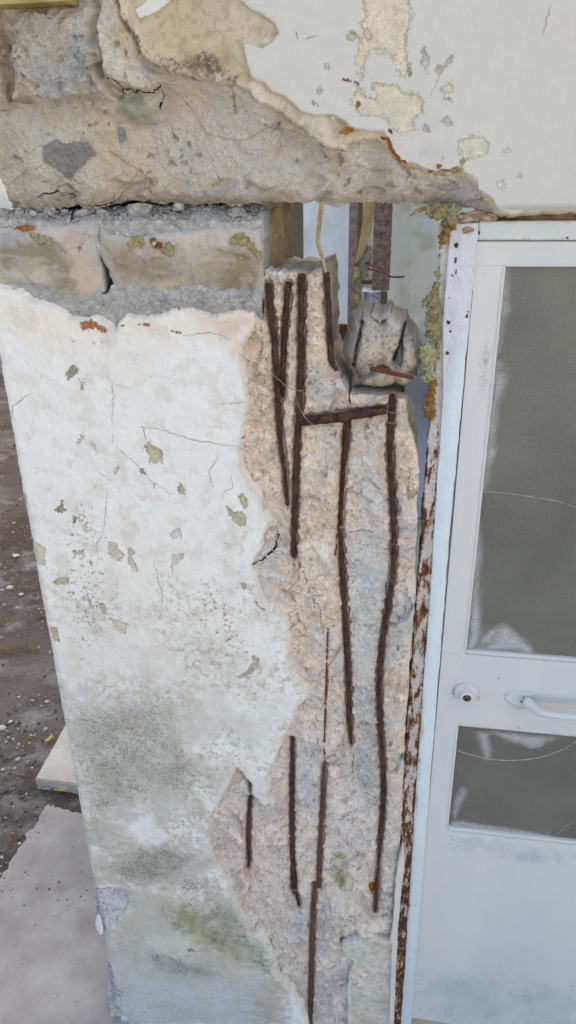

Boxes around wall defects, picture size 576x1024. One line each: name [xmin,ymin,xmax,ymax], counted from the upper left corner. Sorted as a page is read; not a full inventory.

crack [107,77,165,109]
spalling [0,0,492,291]
rust [73,319,109,343]
peeling [139,442,163,488]
peeling [55,500,87,531]
peeling [31,534,46,565]
peeling [108,542,138,572]
crack [252,533,280,565]
peeling [88,600,128,634]
rust [394,220,449,1024]
spalling [210,265,419,1024]